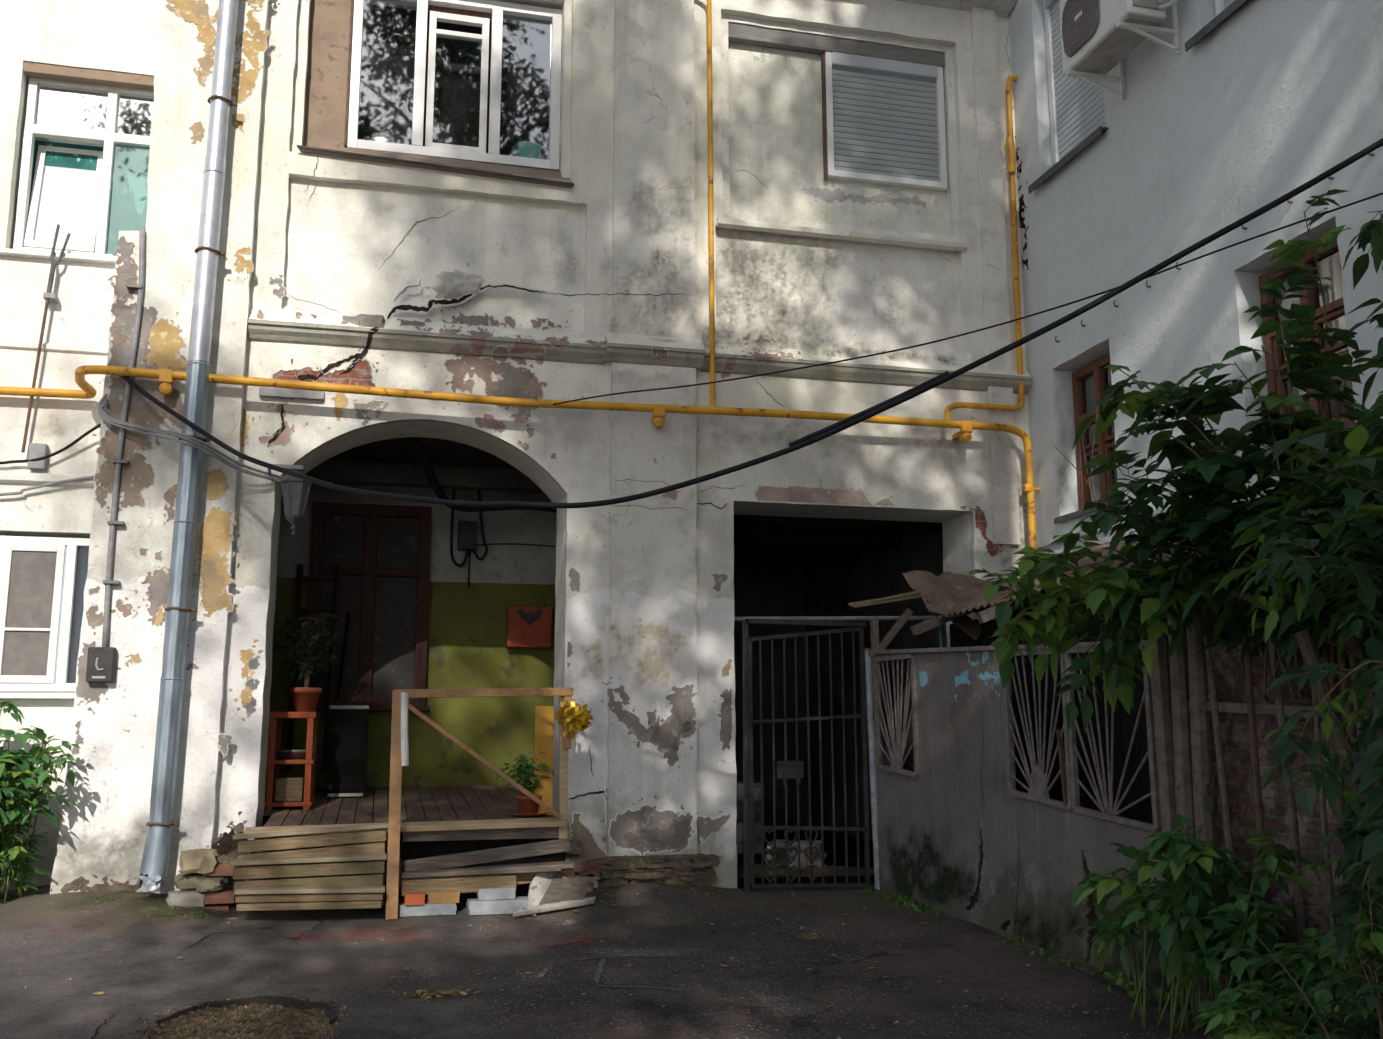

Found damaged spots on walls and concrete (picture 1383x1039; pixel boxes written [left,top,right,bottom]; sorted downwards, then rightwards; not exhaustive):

peeling [156,0,218,87]
peeling [188,121,205,145]
peeling [231,0,272,132]
crack [316,209,695,379]
flaking render [91,226,188,524]
peeling [395,302,610,451]
peeling [191,467,240,629]
spalling [754,472,894,507]
flaking render [68,546,170,756]
flaking render [589,652,733,768]
flaking render [569,793,731,860]
crack [965,713,1019,933]